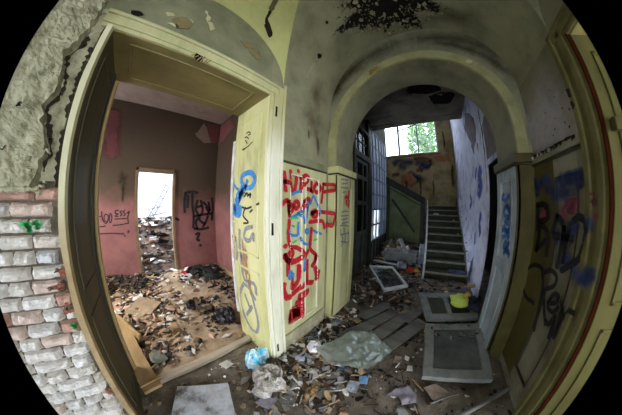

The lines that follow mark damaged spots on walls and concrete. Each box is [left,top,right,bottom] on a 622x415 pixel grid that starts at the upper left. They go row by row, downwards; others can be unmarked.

peeling [346,0,435,35]
flaking render [195,119,233,146]
spalling [46,268,66,292]